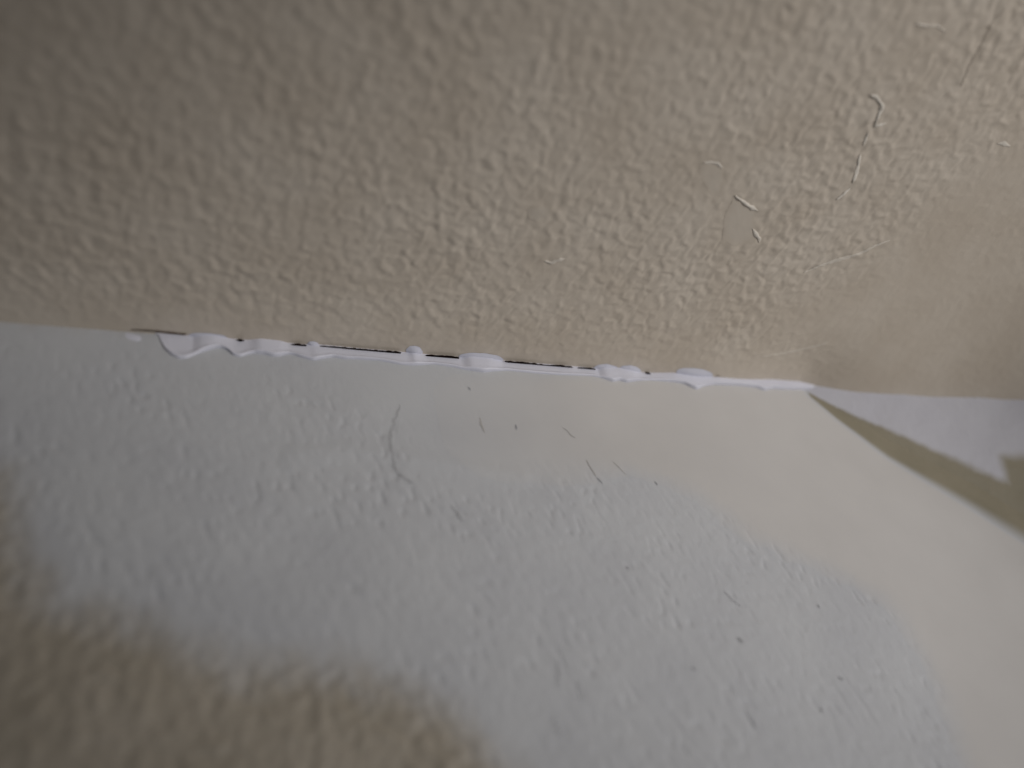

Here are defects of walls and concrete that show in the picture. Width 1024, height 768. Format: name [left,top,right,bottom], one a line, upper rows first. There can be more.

crack [133,328,187,336]
crack [291,343,401,354]
crack [426,352,459,360]
crack [505,361,595,370]